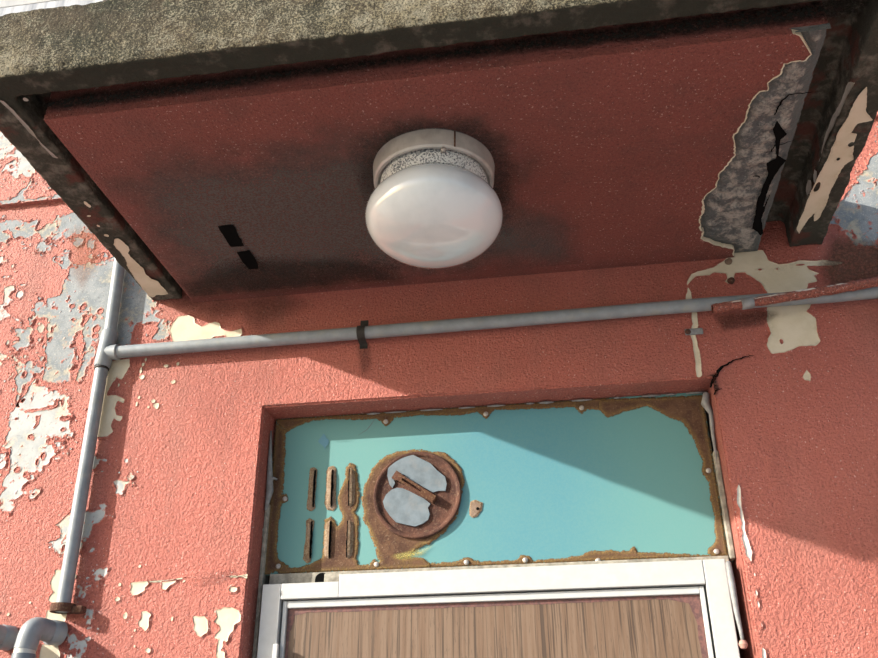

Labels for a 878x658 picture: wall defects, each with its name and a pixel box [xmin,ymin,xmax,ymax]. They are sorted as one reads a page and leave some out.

peeling [0,100,58,158]
spalling [684,23,844,293]
peeling [797,82,878,250]
peeling [0,131,245,523]
crack [686,288,754,395]
peeling [764,304,823,356]
peeling [38,455,179,658]
peeling [191,584,244,658]
rust [265,395,728,575]
peeling [734,482,756,576]
peeling [752,587,766,631]
peeling [758,645,769,658]